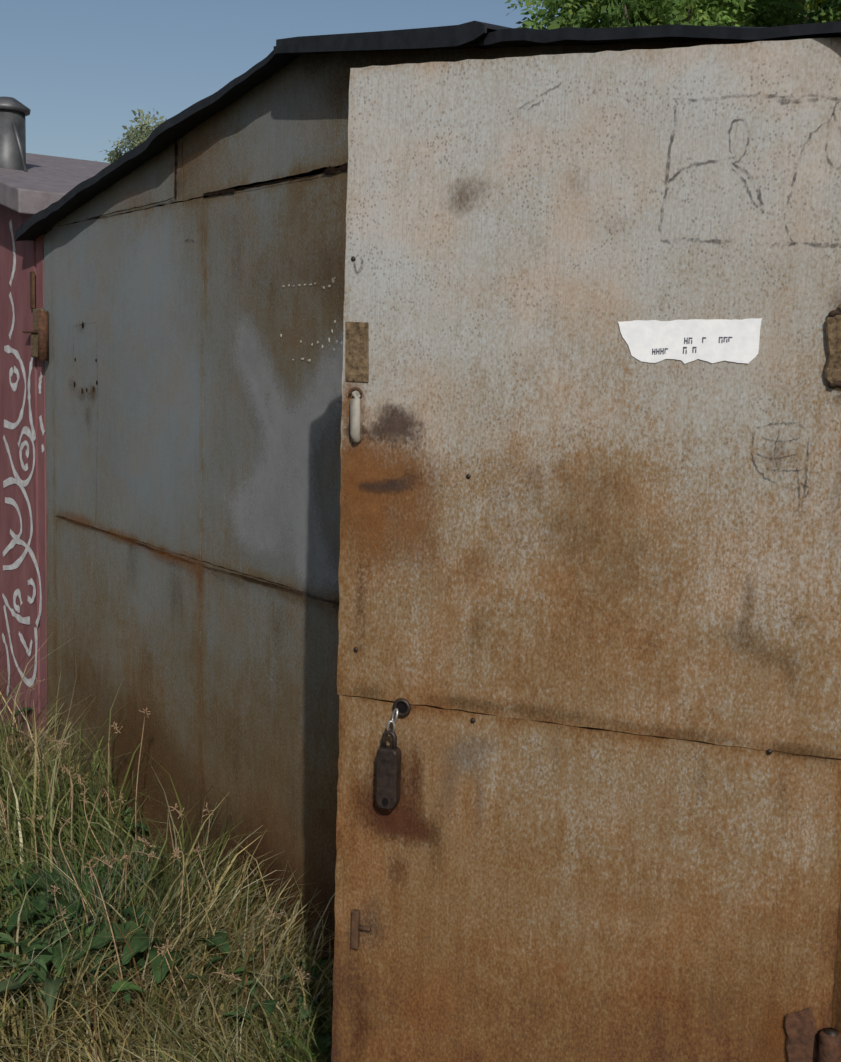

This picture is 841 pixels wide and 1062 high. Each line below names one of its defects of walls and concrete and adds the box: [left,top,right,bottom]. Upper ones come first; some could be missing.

corrosion [341,384,429,562]
corrosion [358,763,438,842]